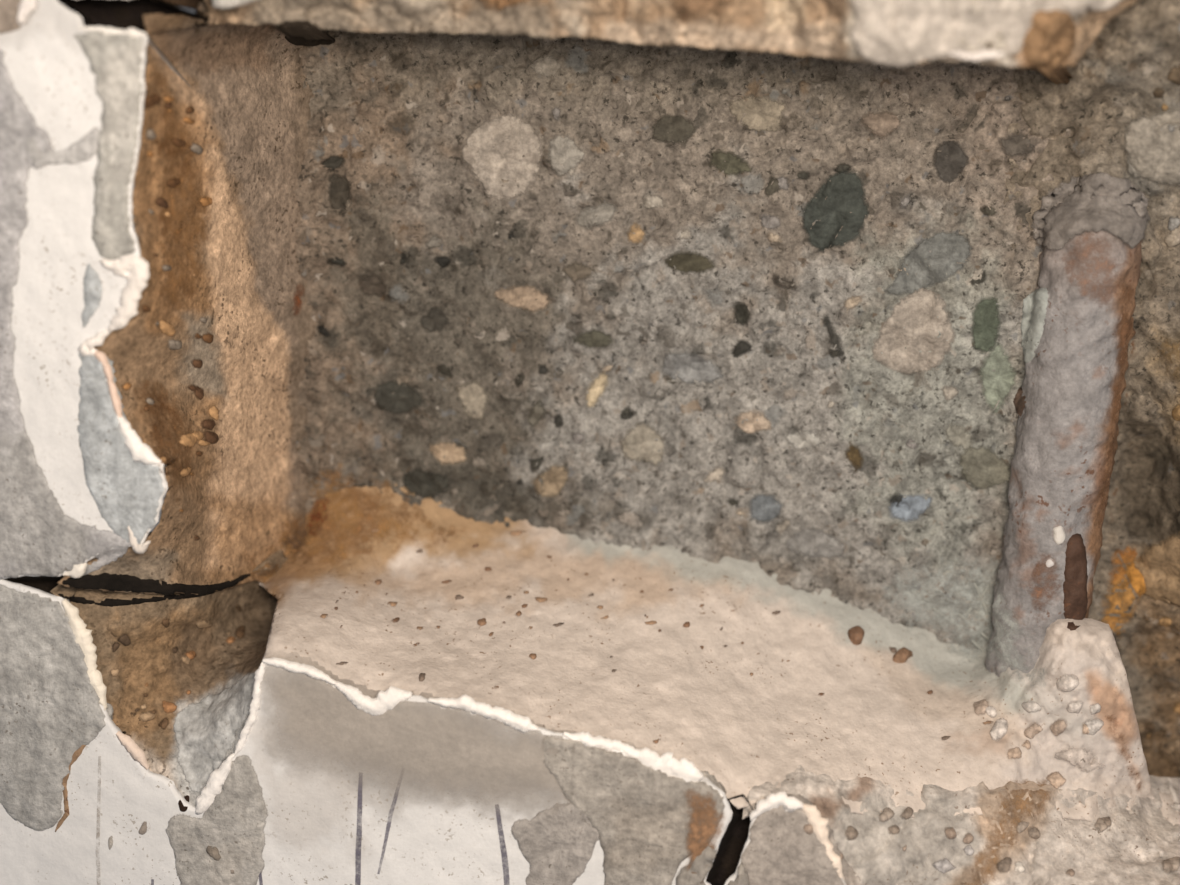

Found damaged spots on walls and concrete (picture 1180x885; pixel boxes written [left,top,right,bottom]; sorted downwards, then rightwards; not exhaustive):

flaking render [0,0,38,34]
damp [82,264,102,327]
damp [77,354,165,545]
flaking render [50,13,412,815]
spalling [195,0,1138,649]
spalling [742,0,1180,885]
corrosion [1112,313,1134,421]
corrosion [1103,547,1141,633]
spalling [428,694,539,733]
spalling [563,731,703,782]